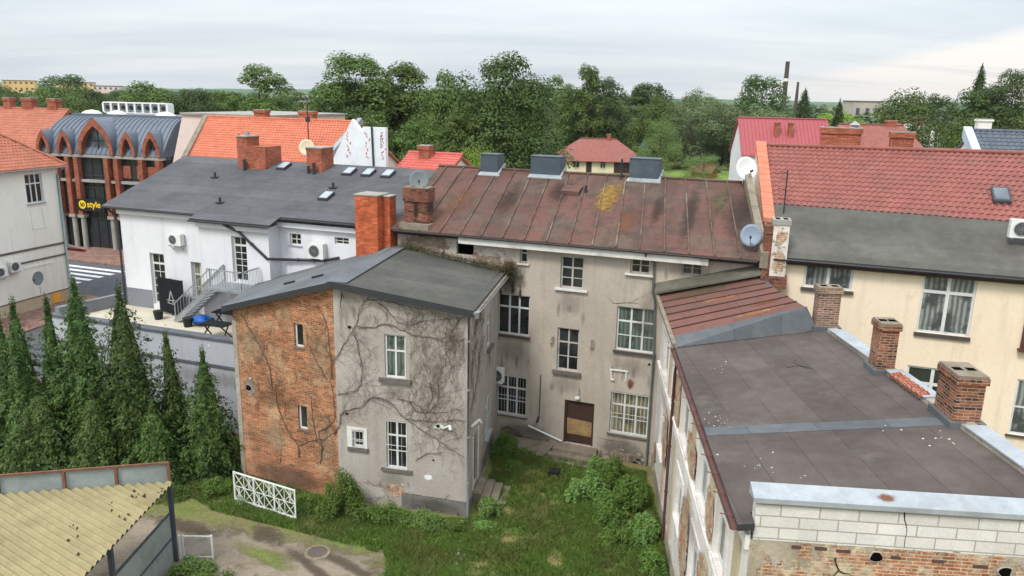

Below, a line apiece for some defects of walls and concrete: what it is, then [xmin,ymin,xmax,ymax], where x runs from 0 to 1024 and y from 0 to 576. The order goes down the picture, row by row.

peeling [771,228,788,273]
peeling [600,373,696,480]
flaking render [357,480,410,503]